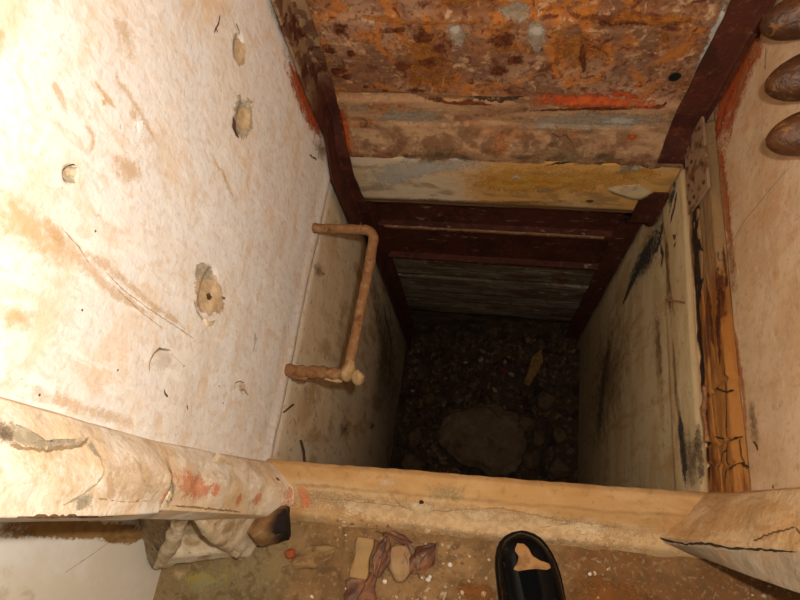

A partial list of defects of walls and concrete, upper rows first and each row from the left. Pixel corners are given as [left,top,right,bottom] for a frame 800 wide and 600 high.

rust [364,15,491,106]
rust [432,0,531,76]
spalling [232,94,253,139]
rust [287,62,324,160]
rust [530,91,656,111]
spalling [62,164,77,183]
rust [706,31,763,365]
spalling [194,262,225,326]
crack [687,197,750,485]
spalling [0,422,88,452]
water stain [672,402,704,484]
crack [660,527,800,552]